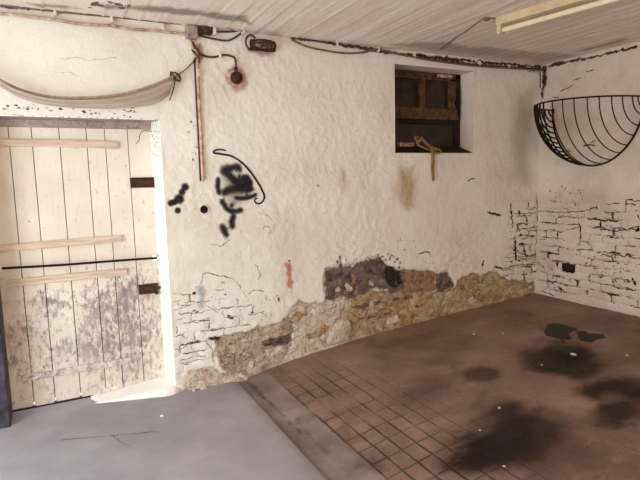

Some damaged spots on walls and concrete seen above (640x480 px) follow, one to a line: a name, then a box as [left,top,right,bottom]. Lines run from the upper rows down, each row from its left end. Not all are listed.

crack [174,266,284,365]
spalling [209,253,535,378]
water stain [465,368,496,380]
water stain [527,323,605,378]
water stain [580,378,640,425]
water stain [462,403,554,469]